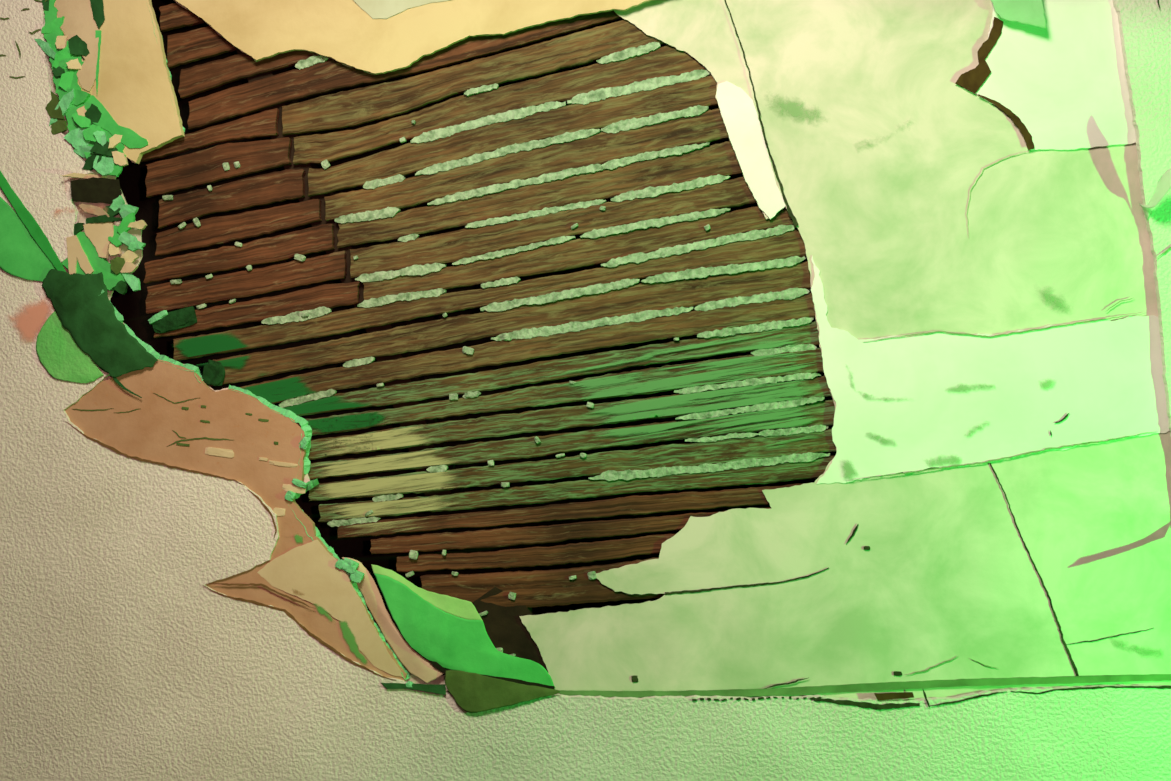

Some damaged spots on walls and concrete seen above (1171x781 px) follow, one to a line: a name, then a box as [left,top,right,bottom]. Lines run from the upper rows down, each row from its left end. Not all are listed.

spalling [34,0,148,179]
crack [955,17,1034,231]
spalling [0,171,554,687]
crack [764,413,1171,710]